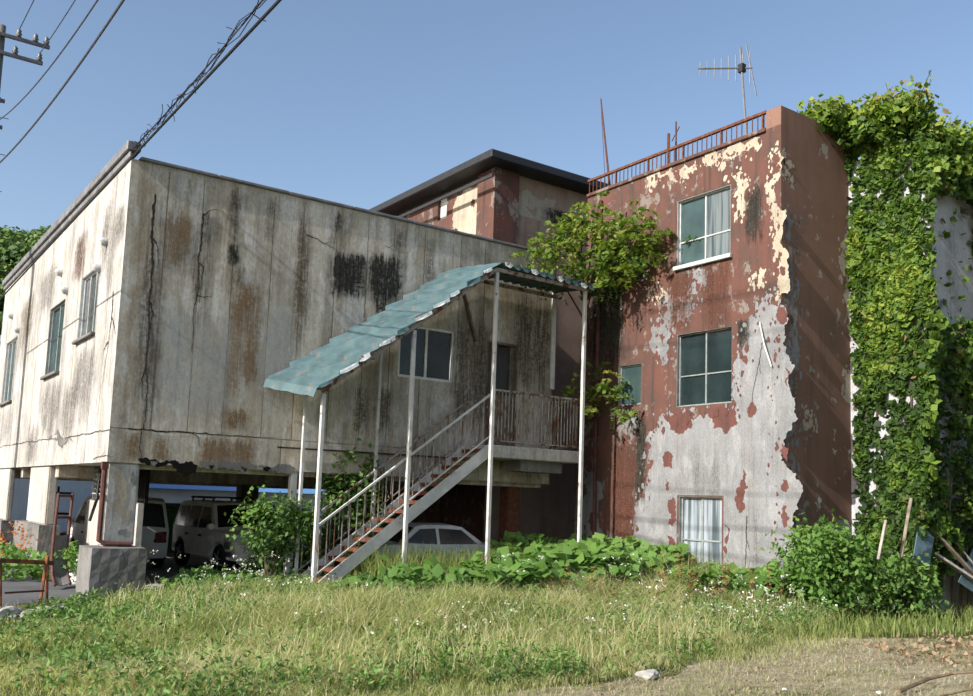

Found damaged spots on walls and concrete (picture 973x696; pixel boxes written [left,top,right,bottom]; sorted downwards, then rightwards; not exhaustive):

crack [0,193,277,459]
peeling [111,457,295,536]
mould [331,253,402,313]
peeling [620,137,852,592]